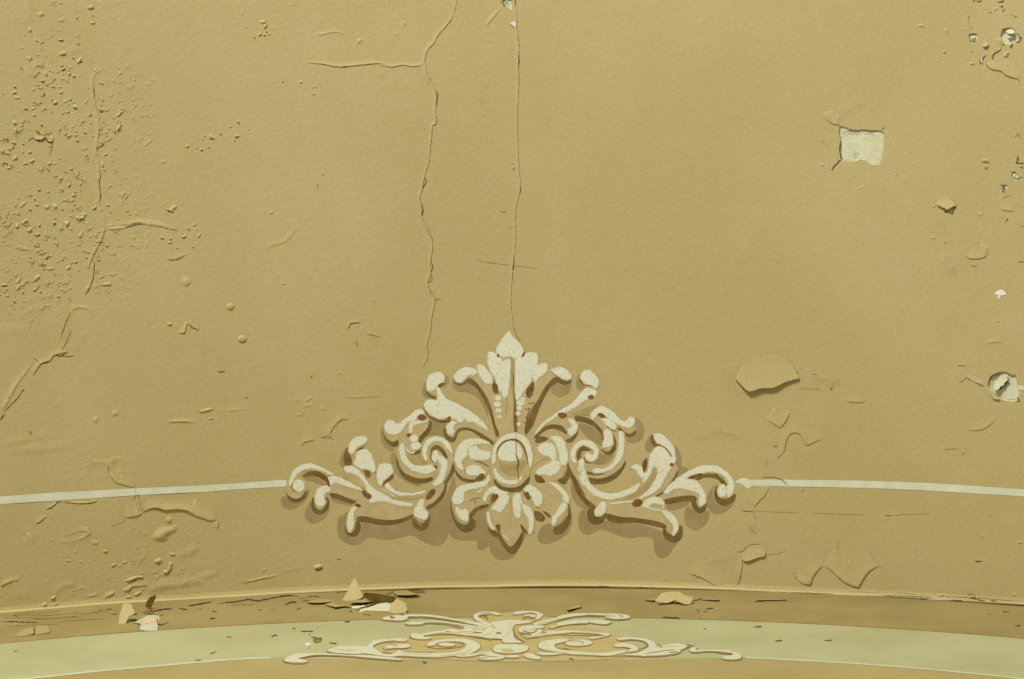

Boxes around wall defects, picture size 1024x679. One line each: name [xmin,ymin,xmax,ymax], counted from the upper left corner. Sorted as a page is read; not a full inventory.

peeling [963,17,1024,82]
spalling [824,89,884,170]
crack [307,0,457,368]
crack [485,0,531,341]
crack [0,217,177,420]
spalling [987,372,1024,402]
crack [733,544,782,585]
spalling [118,595,171,631]
peeling [285,578,425,622]